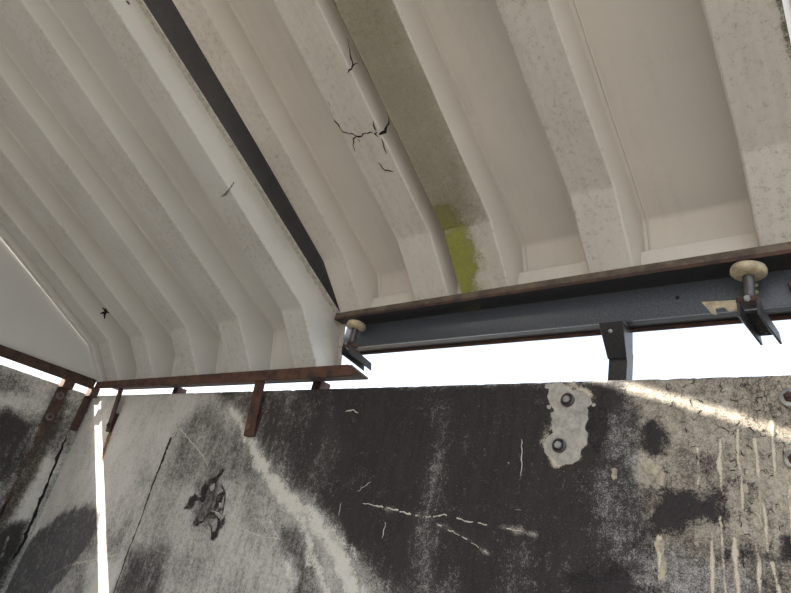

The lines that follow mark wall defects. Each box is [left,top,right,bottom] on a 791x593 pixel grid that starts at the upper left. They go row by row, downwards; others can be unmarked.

crack [328,102,393,172]
leakage [432,204,480,293]
spalling [541,380,596,468]
crack [12,436,67,560]
peeling [184,466,226,541]
crack [363,503,487,554]
crack [506,526,536,536]
leakage [569,420,791,593]